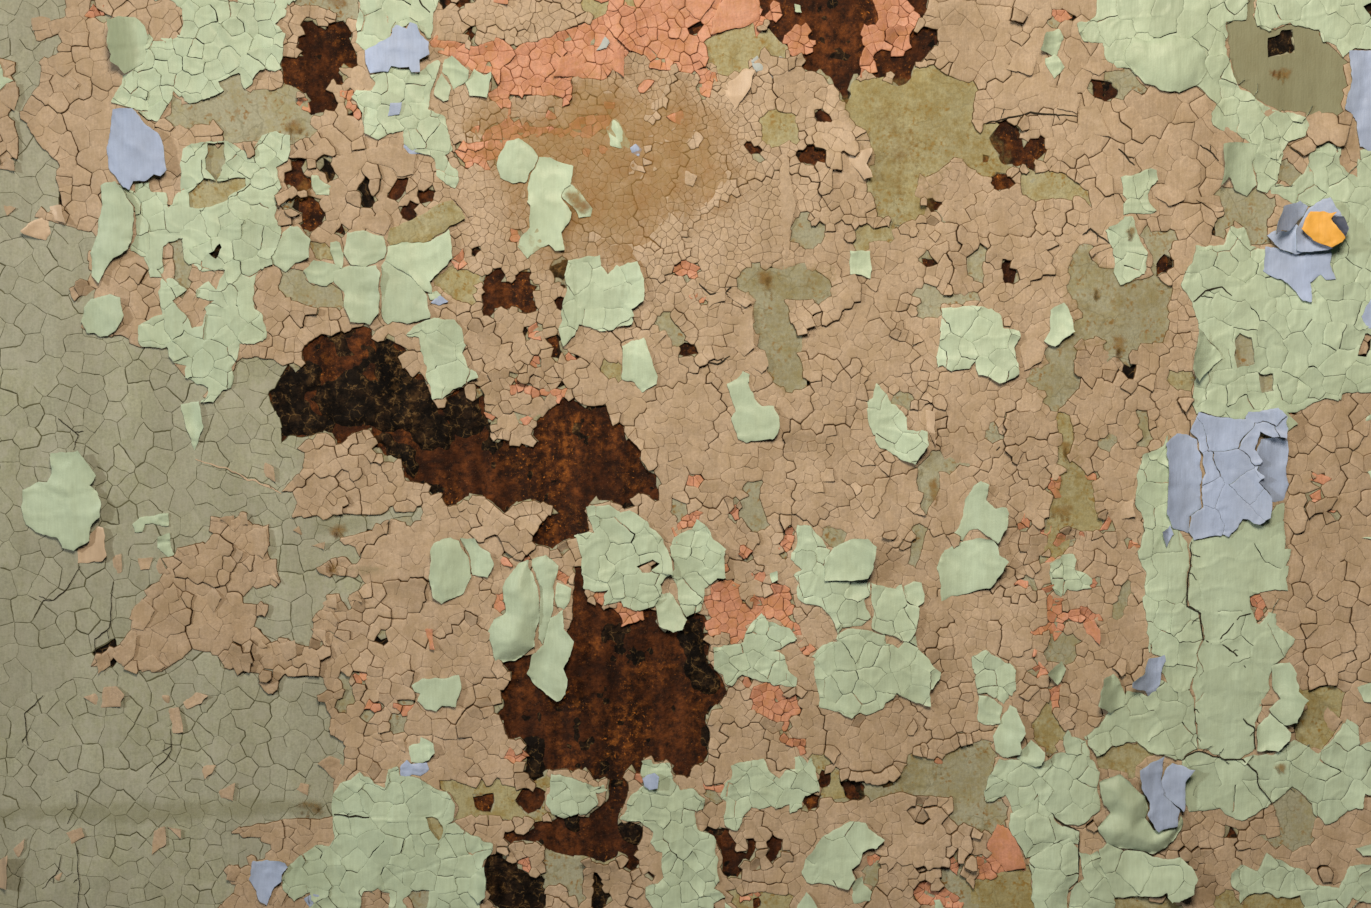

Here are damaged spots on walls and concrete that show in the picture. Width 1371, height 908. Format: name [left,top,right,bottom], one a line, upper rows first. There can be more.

corrosion [281,21,357,115]
corrosion [760,0,938,104]
crack [987,108,1077,123]
peeling [20,205,66,241]
peeling [21,451,174,573]
crack [0,0,423,908]
peeling [429,537,494,604]
corrosion [269,326,659,549]
peeling [510,0,1371,908]
crack [1186,542,1251,668]
corrosion [484,567,727,908]
crack [1182,692,1272,804]